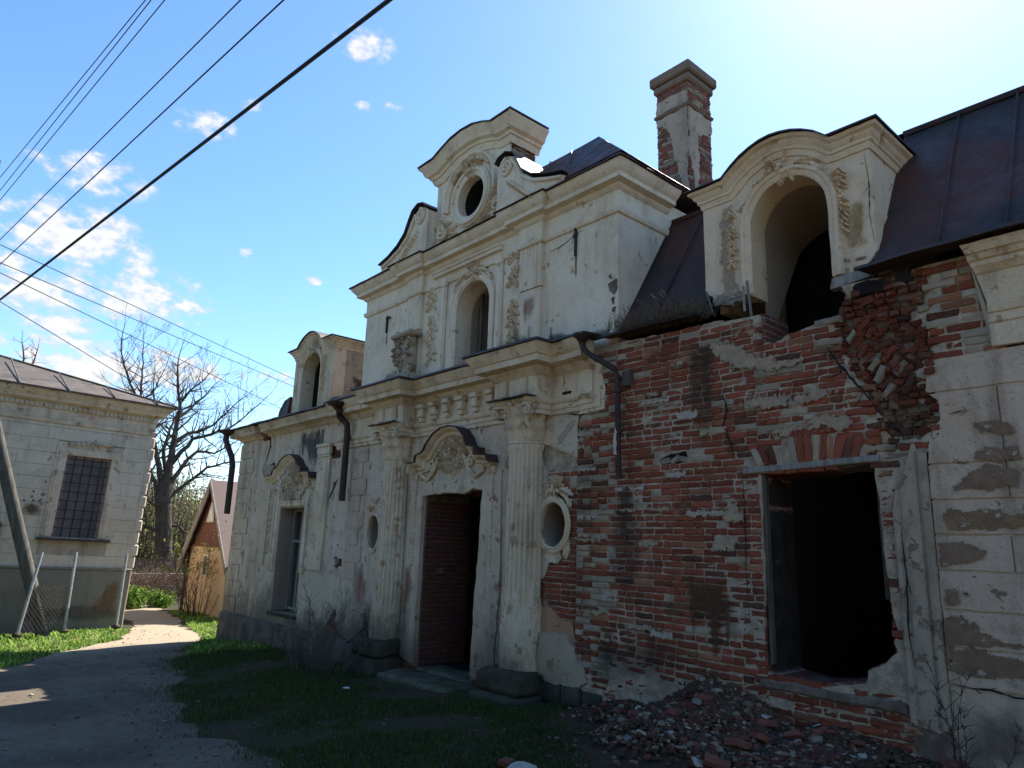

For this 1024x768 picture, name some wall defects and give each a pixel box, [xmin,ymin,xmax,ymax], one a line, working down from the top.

crack [863,154,875,240]
crack [822,345,882,416]
flaking render [540,205,1009,754]
peeling [951,420,1022,495]
peeling [937,508,1024,568]
damp [690,583,730,656]
crack [901,528,915,666]
peeling [943,588,1024,680]